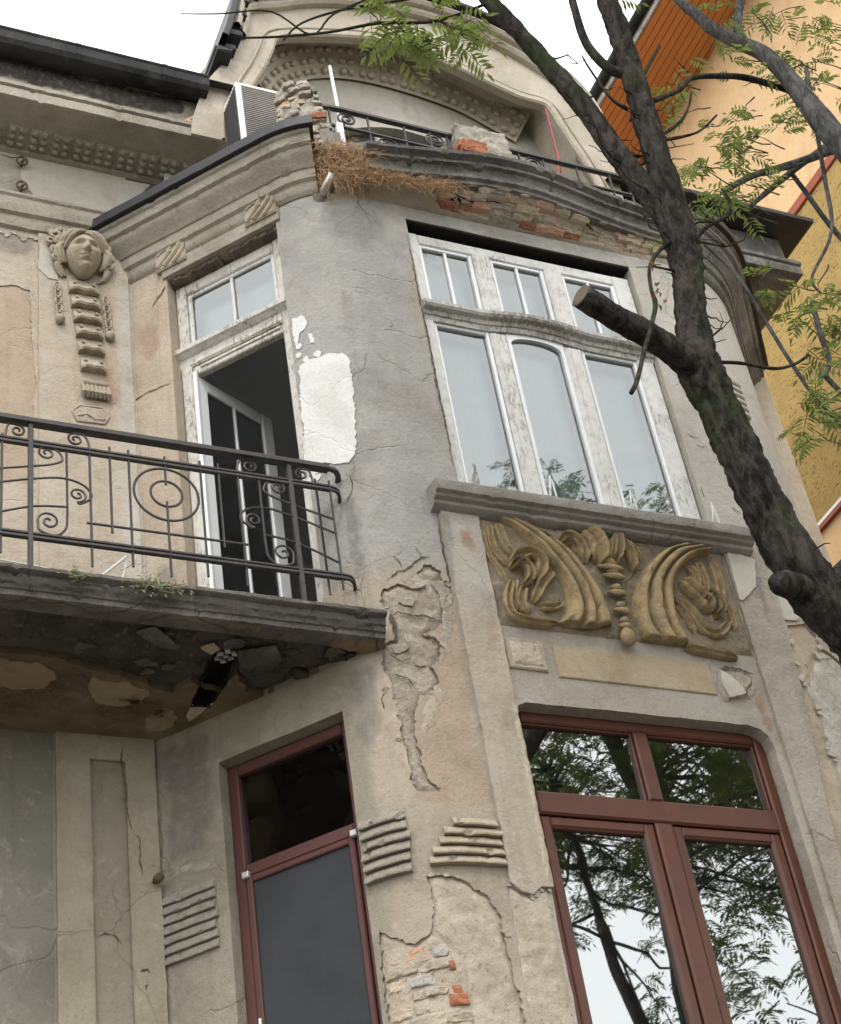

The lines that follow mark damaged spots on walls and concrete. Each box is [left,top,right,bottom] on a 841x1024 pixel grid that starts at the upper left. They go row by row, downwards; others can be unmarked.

flaking render [433,181,667,259]
spalling [0,608,356,733]
spalling [380,565,456,792]
spalling [717,666,756,702]
spalling [778,596,841,785]
crack [120,746,142,869]
spalling [381,704,575,1024]